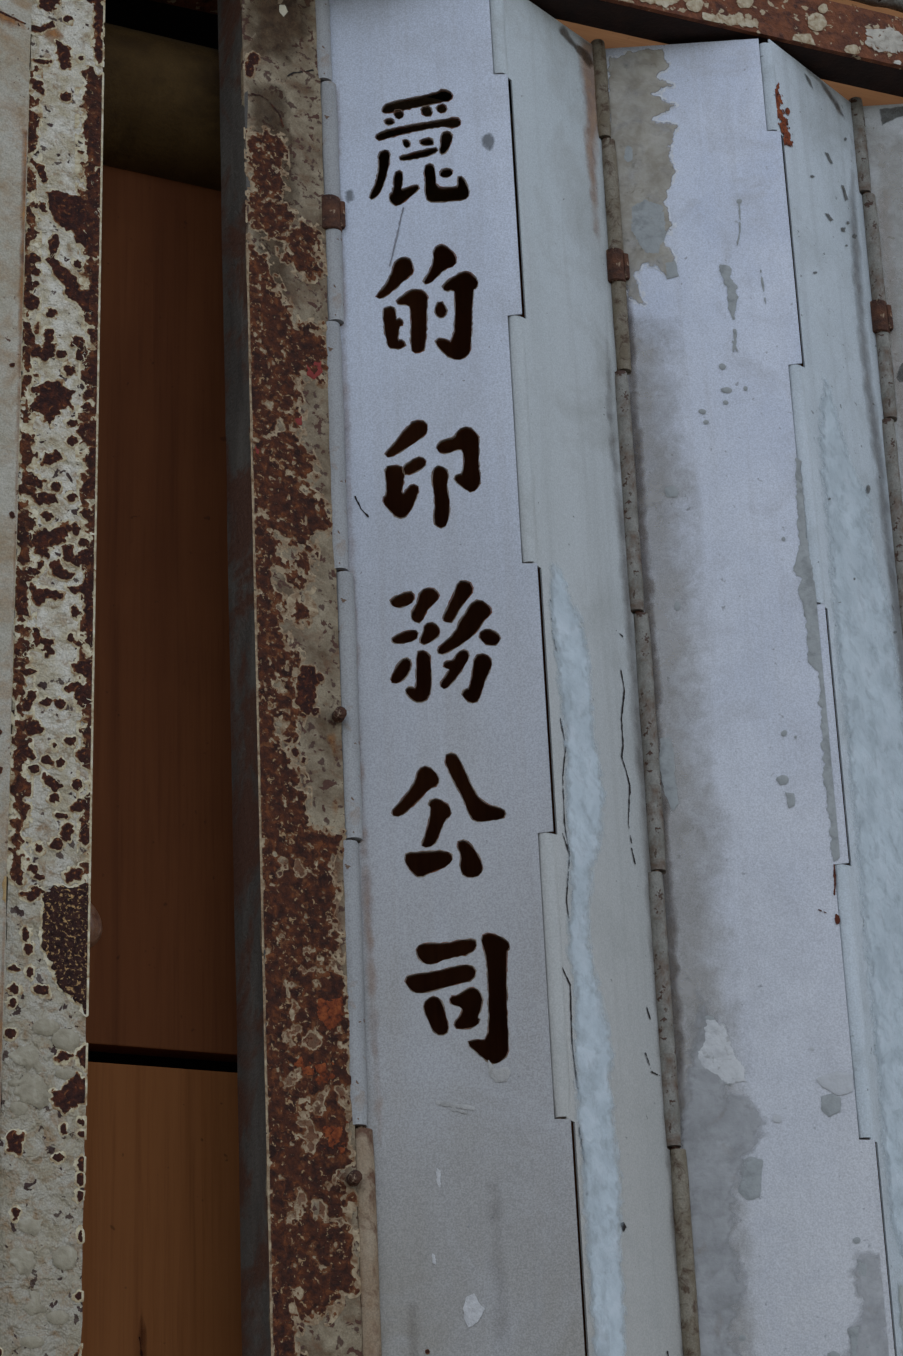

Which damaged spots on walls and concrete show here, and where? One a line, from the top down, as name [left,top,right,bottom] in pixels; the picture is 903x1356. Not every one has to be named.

rust [243,0,307,79]
peeling [621,0,759,28]
peeling [792,3,828,45]
peeling [844,26,903,65]
rust [775,82,794,147]
rust [0,0,105,1047]
rust [244,125,362,1356]
rust [1,1128,27,1158]
rust [48,1042,88,1204]
rust [8,1205,23,1224]
rust [75,1225,85,1244]
rust [71,1289,84,1303]